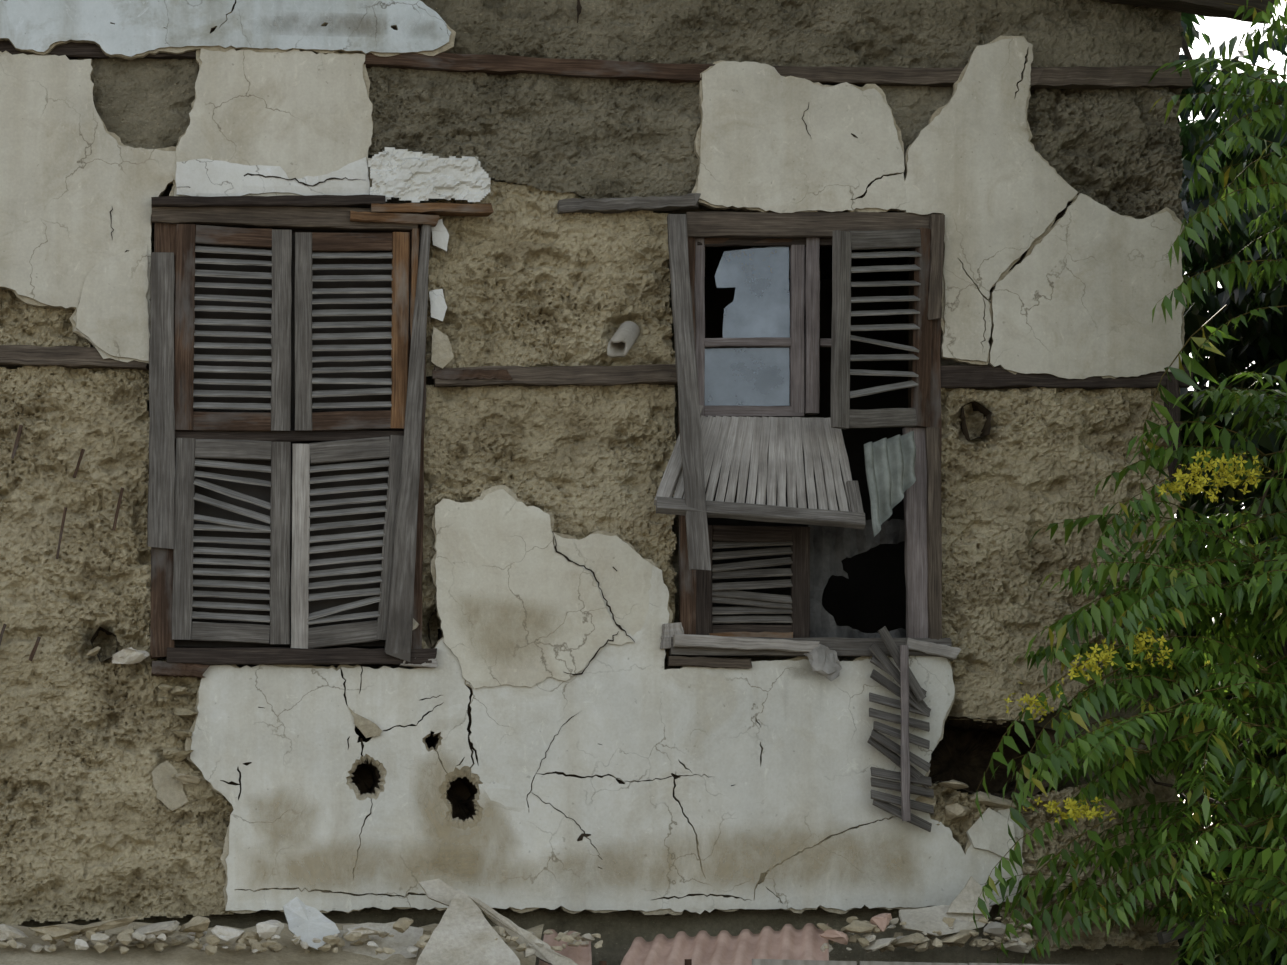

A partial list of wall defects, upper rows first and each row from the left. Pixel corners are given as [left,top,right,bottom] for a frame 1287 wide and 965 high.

flaking render [421,0,1184,68]
flaking render [78,58,199,149]
crack [989,251,1026,303]
crack [1051,194,1078,227]
flaking render [1027,87,1185,220]
flaking render [366,67,701,649]
flaking render [0,365,234,925]
crack [552,531,634,675]
flaking render [941,386,1183,724]
crack [347,686,478,773]
crack [238,799,426,897]
crack [526,711,880,900]